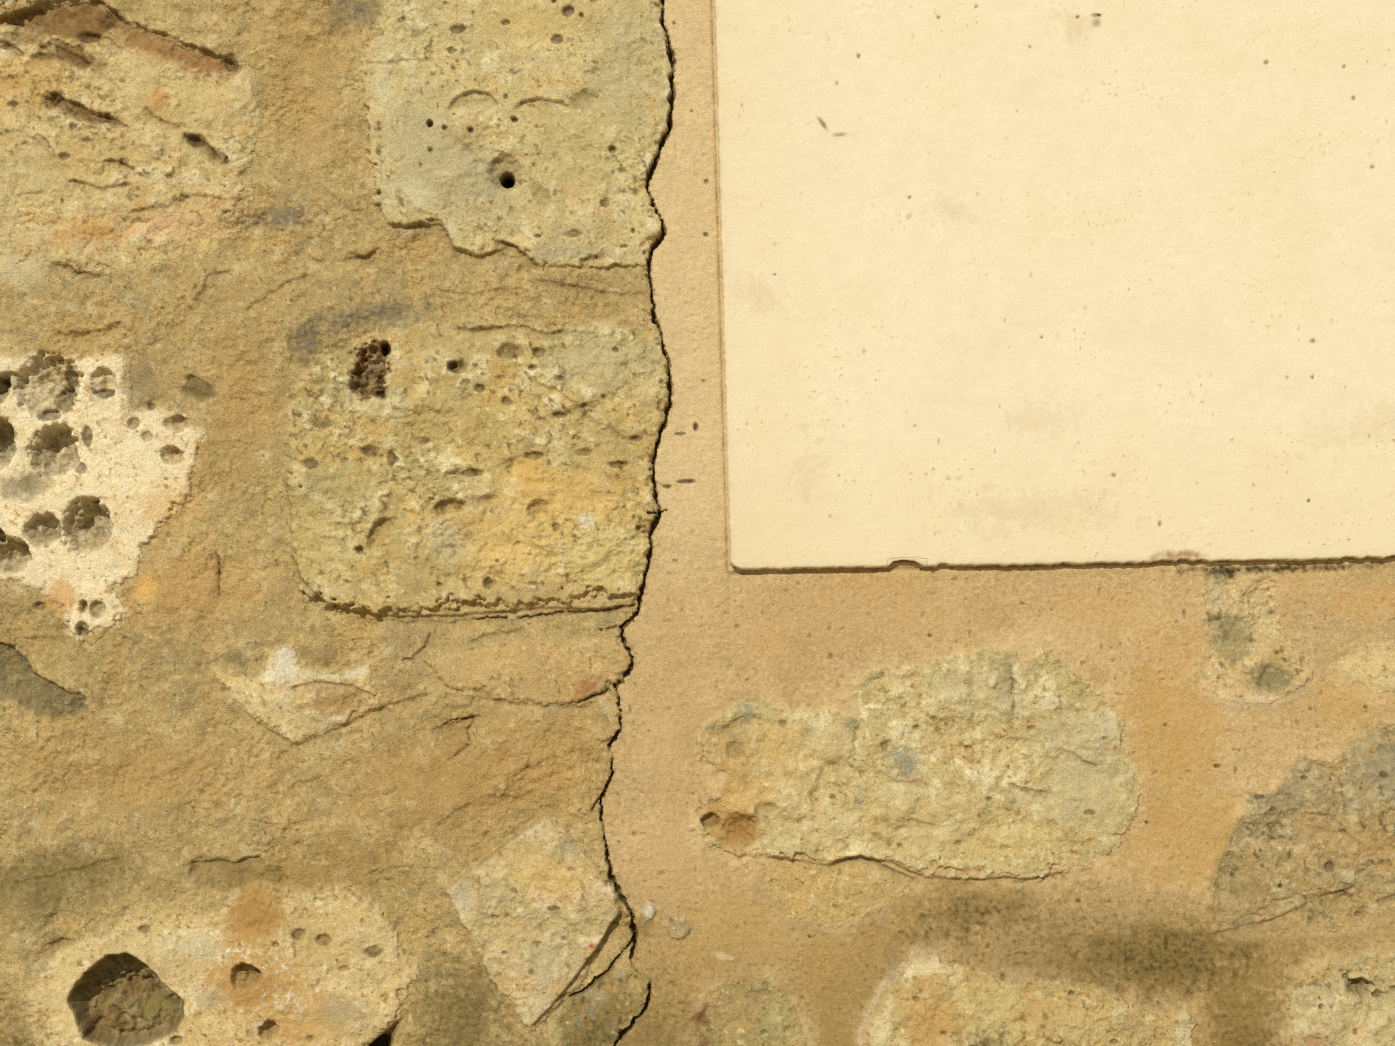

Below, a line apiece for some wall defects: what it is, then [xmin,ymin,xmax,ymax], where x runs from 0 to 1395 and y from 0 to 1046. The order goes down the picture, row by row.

crack [467,0,677,1046]